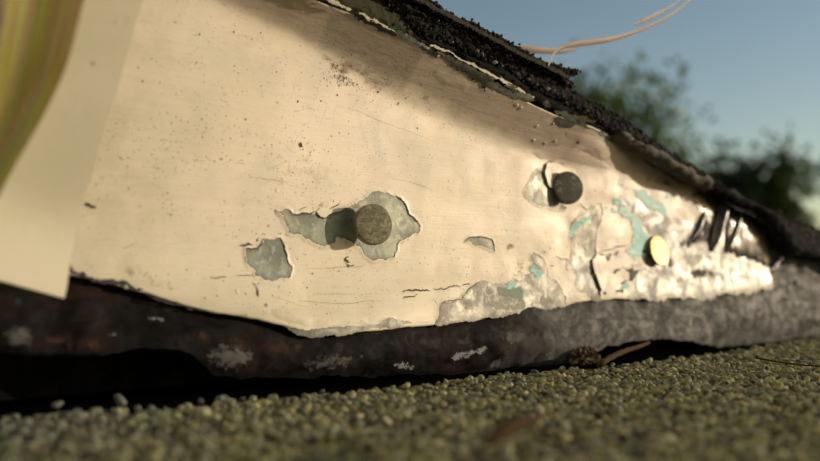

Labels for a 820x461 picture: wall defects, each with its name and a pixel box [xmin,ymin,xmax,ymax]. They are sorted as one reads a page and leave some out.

peeling [241,187,423,286]
peeling [435,162,609,326]
peeling [620,191,773,302]
peeling [286,315,412,338]